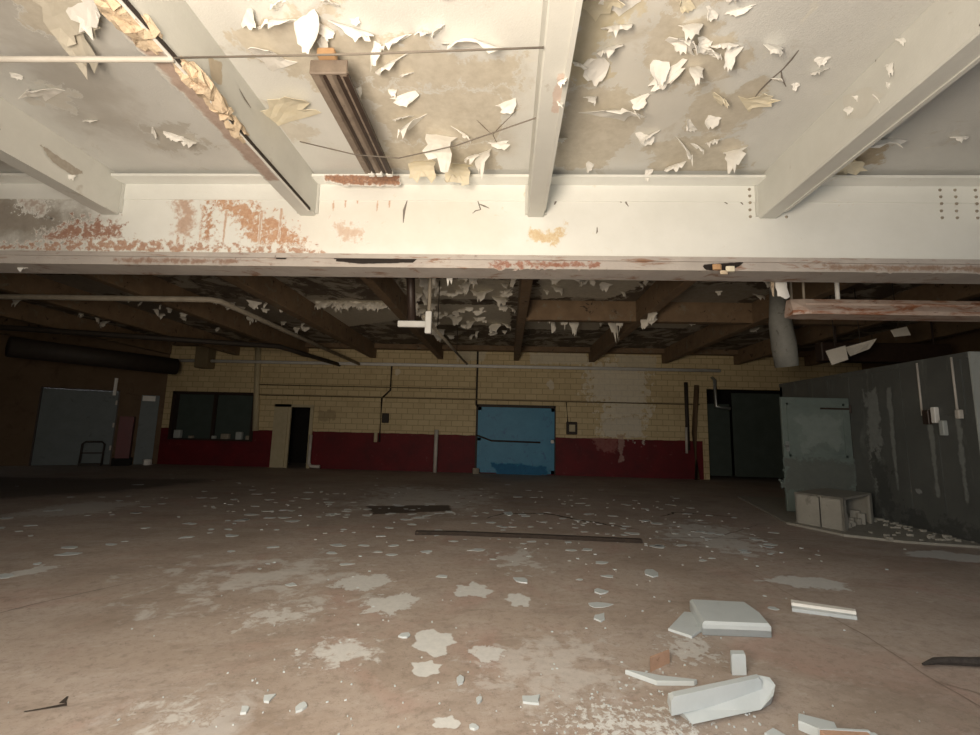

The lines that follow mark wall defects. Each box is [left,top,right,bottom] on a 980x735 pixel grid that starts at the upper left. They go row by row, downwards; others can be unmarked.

peeling [11,0,163,80]
spalling [173,56,249,144]
peeling [221,0,533,186]
peeling [551,0,800,182]
rust [323,174,401,187]
peeling [835,134,907,175]
rust [0,199,417,267]
peeling [401,278,516,363]
rust [525,219,569,248]
rust [488,260,606,271]
peeling [525,322,623,342]
peeling [536,279,649,299]